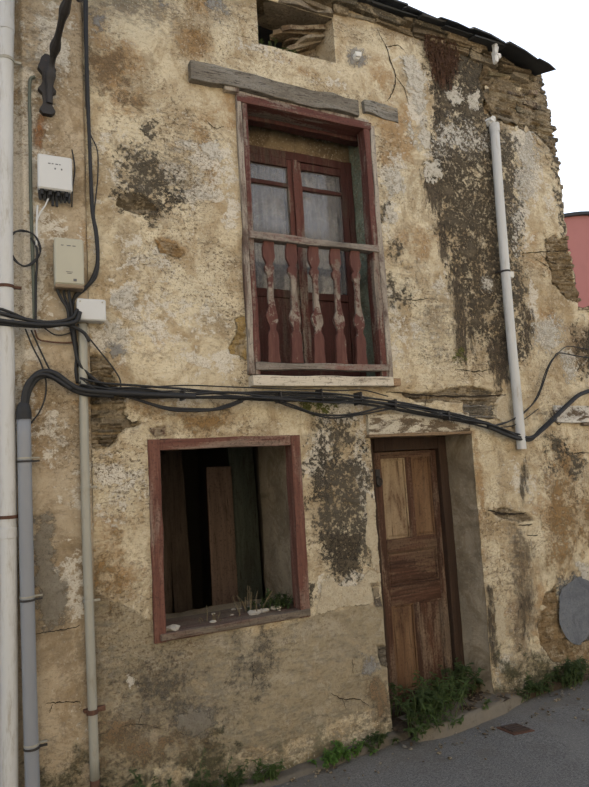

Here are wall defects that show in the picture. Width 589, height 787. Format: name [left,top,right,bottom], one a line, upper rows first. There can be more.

water stain [89,49,143,113]
crack [377,29,409,104]
spalling [116,188,157,215]
water stain [108,119,188,229]
water stain [417,42,535,392]
spalling [444,56,558,259]
water stain [550,155,566,237]
spalling [541,231,579,303]
spalling [90,347,140,450]
spalling [402,383,529,427]
water stain [302,406,379,586]
spalling [532,580,589,664]